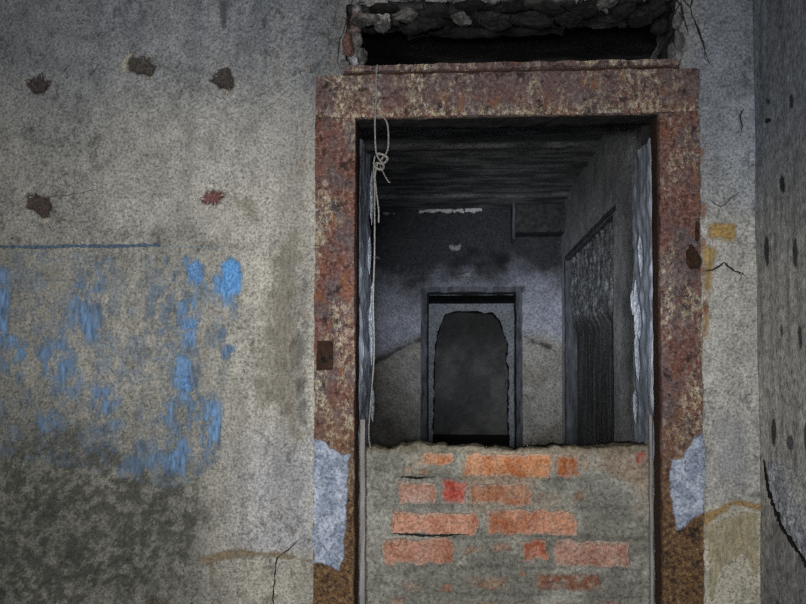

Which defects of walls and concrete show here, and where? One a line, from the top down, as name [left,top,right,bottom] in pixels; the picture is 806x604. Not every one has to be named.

crack [674,0,711,66]
spalling [120,53,156,80]
spalling [19,190,60,223]
peeling [0,268,26,372]
peeling [38,341,74,392]
peeling [69,272,104,340]
peeling [0,243,227,286]
peeling [126,297,221,474]
peeling [217,328,234,359]
peeling [214,258,241,304]
flaking render [763,459,806,568]
crack [271,539,300,604]